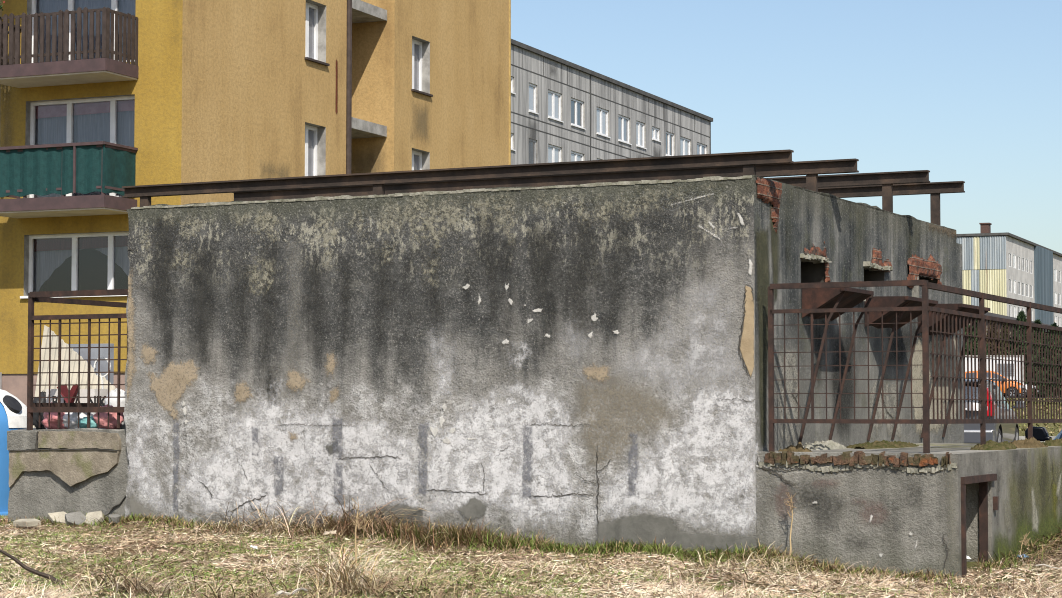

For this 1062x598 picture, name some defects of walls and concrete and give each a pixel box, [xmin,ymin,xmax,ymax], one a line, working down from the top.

spalling [756,177,782,233]
flaking render [127,277,198,419]
water stain [152,221,174,343]
water stain [194,248,214,362]
peeling [636,293,731,389]
peeling [740,286,754,377]
spalling [907,254,942,289]
peeling [7,431,121,488]
crack [199,464,267,516]
crack [532,423,611,524]
water stain [1004,461,1061,531]